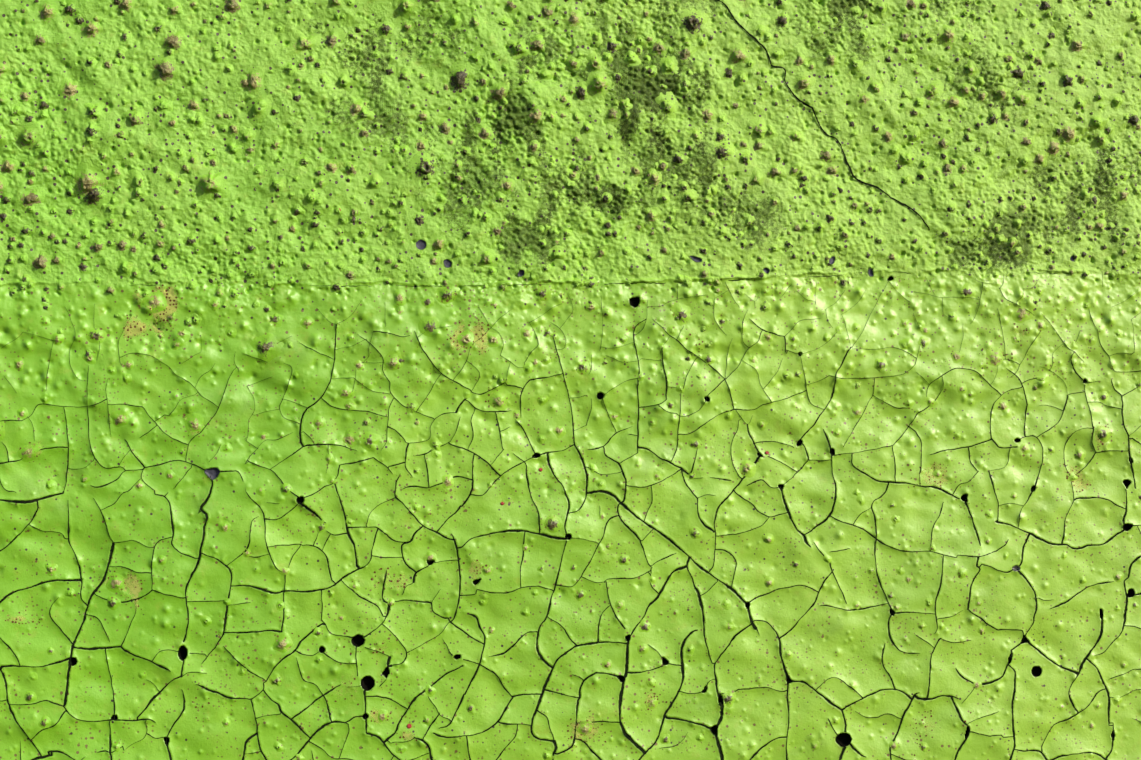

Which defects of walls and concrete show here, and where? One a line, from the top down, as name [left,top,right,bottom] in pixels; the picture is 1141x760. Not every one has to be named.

crack [718,0,930,230]